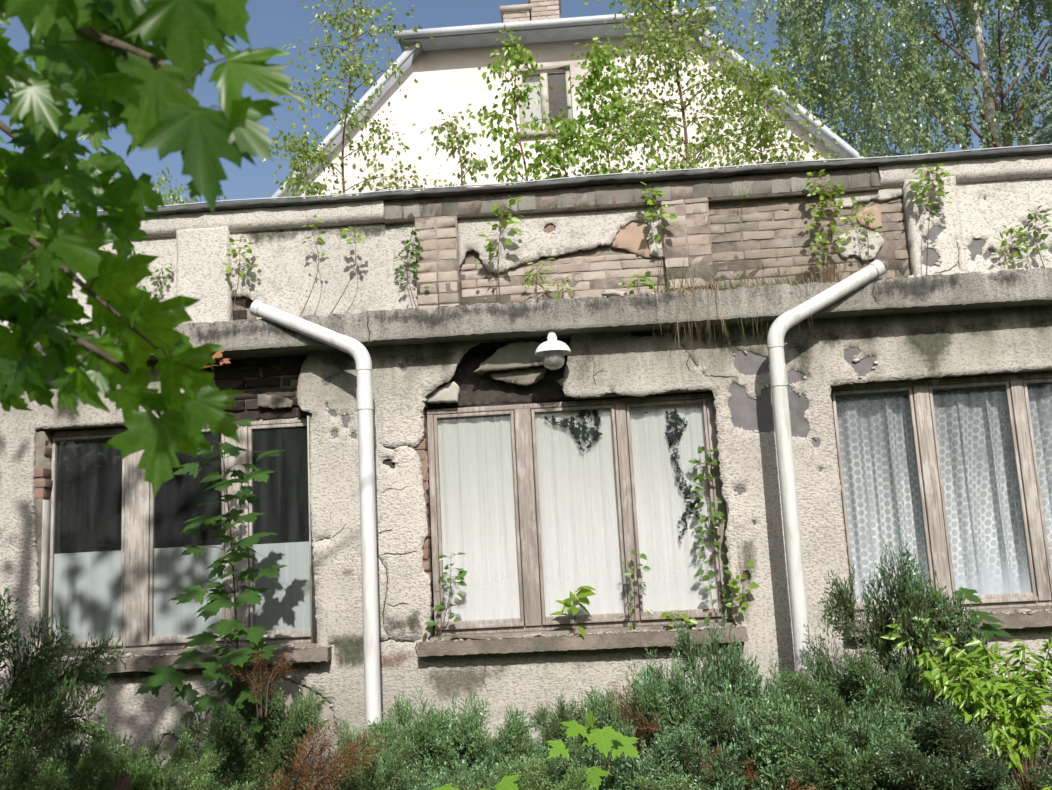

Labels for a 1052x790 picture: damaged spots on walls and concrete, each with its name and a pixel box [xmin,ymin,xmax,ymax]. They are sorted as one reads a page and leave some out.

flaking render [921,203,947,267]
flaking render [964,236,1020,261]
flaking render [728,343,775,433]
flaking render [787,369,821,447]
flaking render [844,347,878,378]
crack [377,529,419,655]